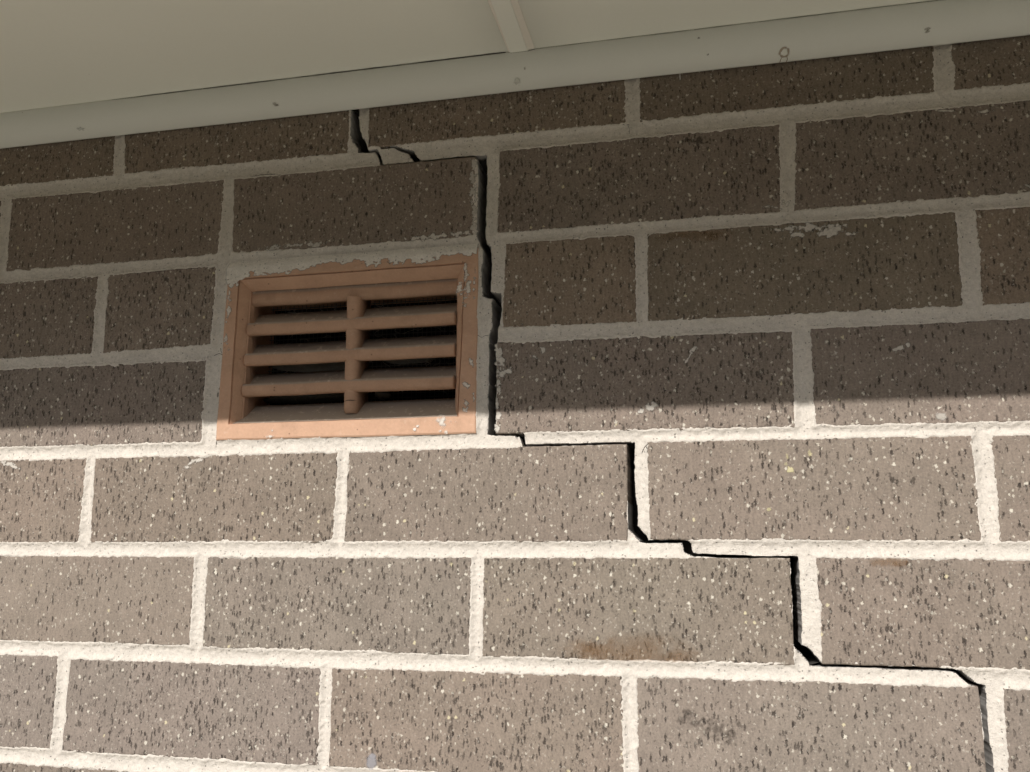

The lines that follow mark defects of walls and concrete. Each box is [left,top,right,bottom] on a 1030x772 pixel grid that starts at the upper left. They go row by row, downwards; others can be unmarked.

crack [350,110,994,772]